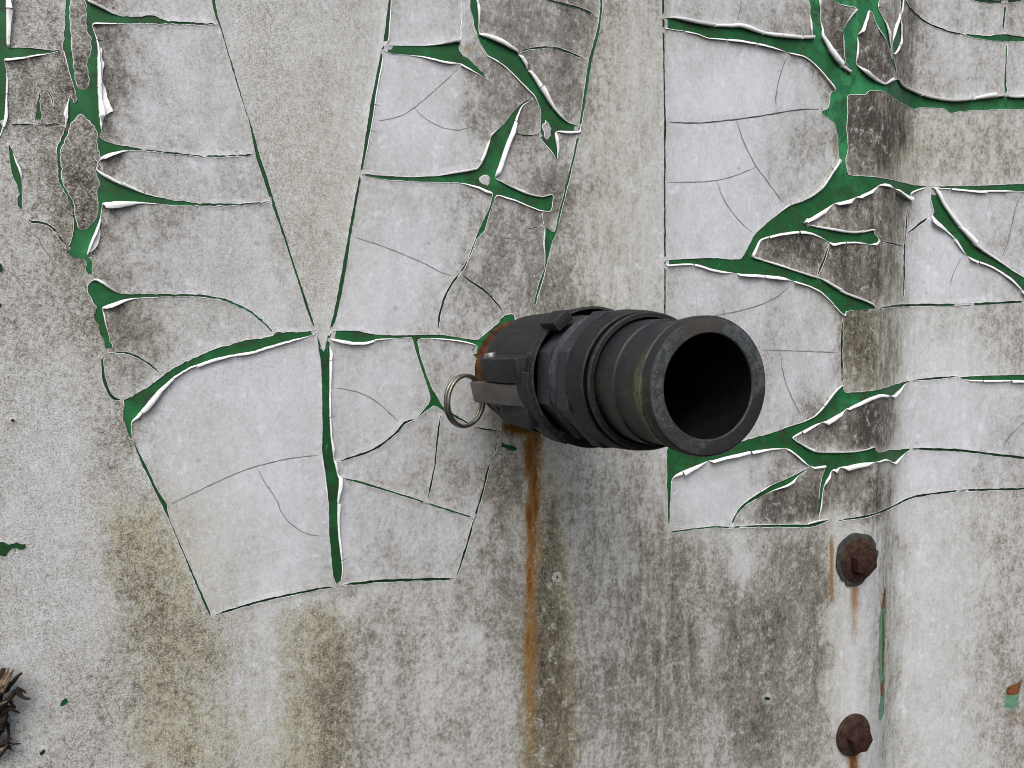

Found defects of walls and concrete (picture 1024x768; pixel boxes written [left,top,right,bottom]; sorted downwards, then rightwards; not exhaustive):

peeling [0,0,586,591]
peeling [662,0,1024,322]
corrosion [499,421,542,719]
peeling [662,376,912,535]
peeling [1000,674,1024,713]